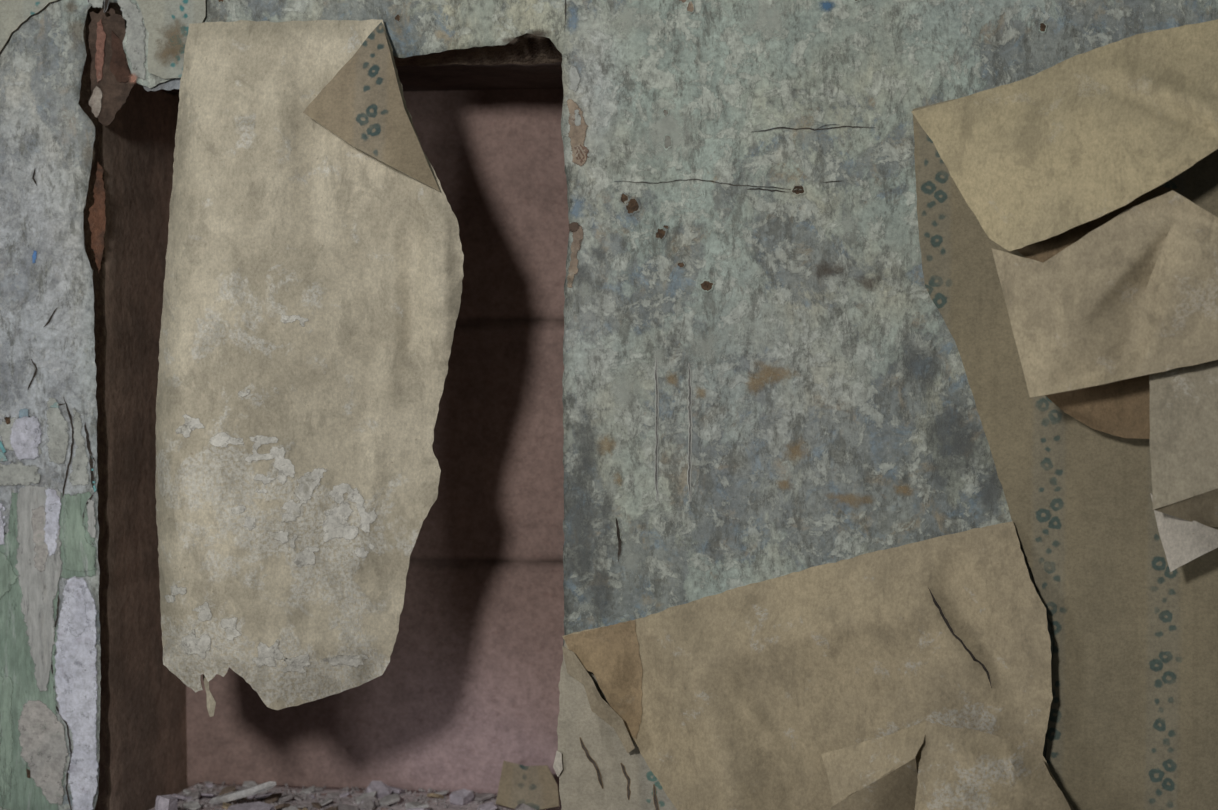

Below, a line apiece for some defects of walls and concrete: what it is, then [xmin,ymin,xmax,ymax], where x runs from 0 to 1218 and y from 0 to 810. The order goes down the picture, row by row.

spalling [88,0,181,126]
spalling [88,163,106,274]
peeling [0,397,99,810]
peeling [553,751,563,777]